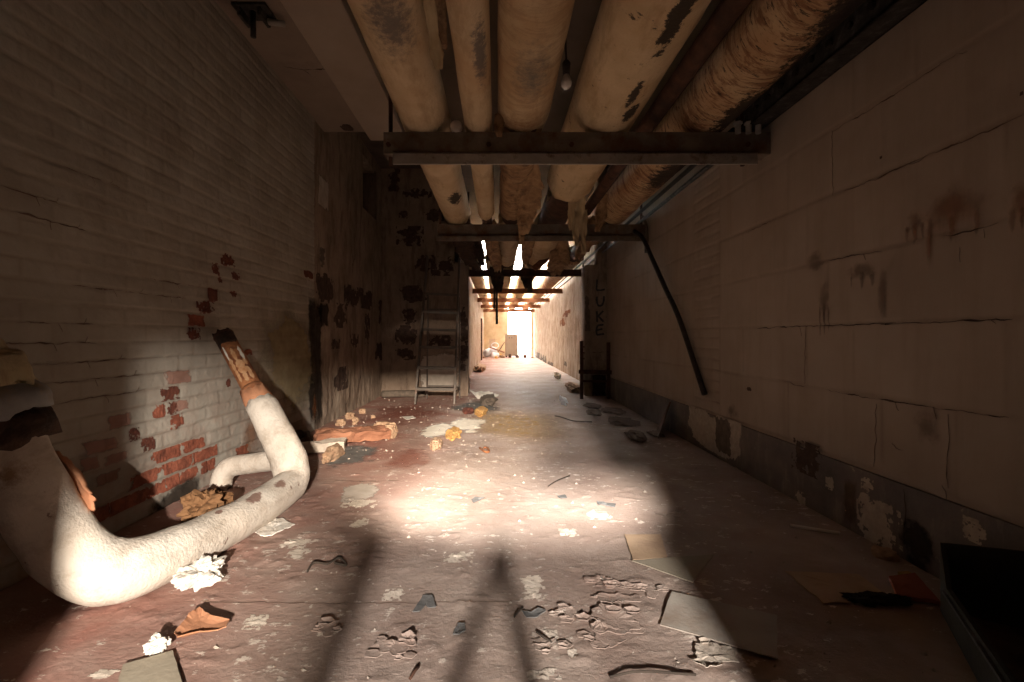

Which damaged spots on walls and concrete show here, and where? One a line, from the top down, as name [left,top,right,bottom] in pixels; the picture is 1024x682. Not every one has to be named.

crack [832,53,1019,195]
crack [1,185,86,231]
peeling [186,253,240,340]
peeling [92,413,218,522]
peeling [152,370,191,430]
leakage [419,353,461,389]
peeling [688,406,742,461]
crack [757,319,1011,387]
peeling [856,477,903,552]